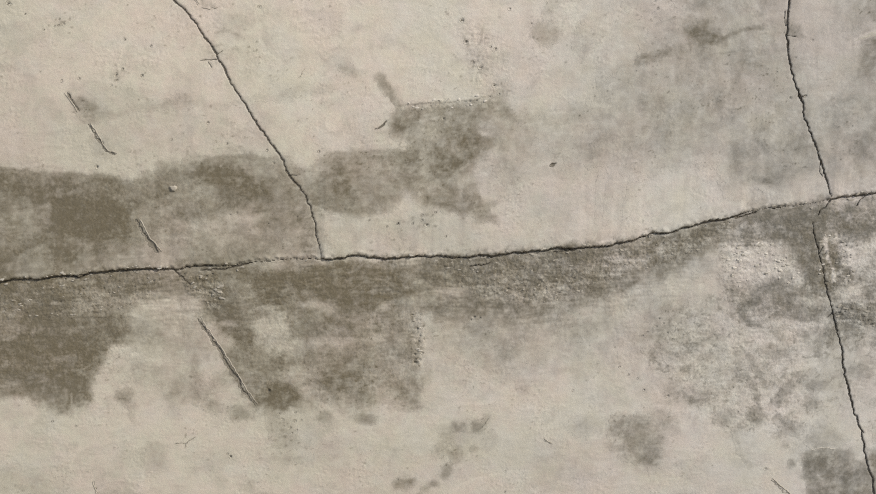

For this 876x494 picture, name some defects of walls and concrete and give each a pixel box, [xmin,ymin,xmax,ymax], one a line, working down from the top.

crack [0,262,251,285]
damp [0,0,876,286]
damp [0,185,876,455]
damp [391,413,492,494]
crack [174,0,775,266]
damp [563,294,876,494]
crack [785,0,876,494]